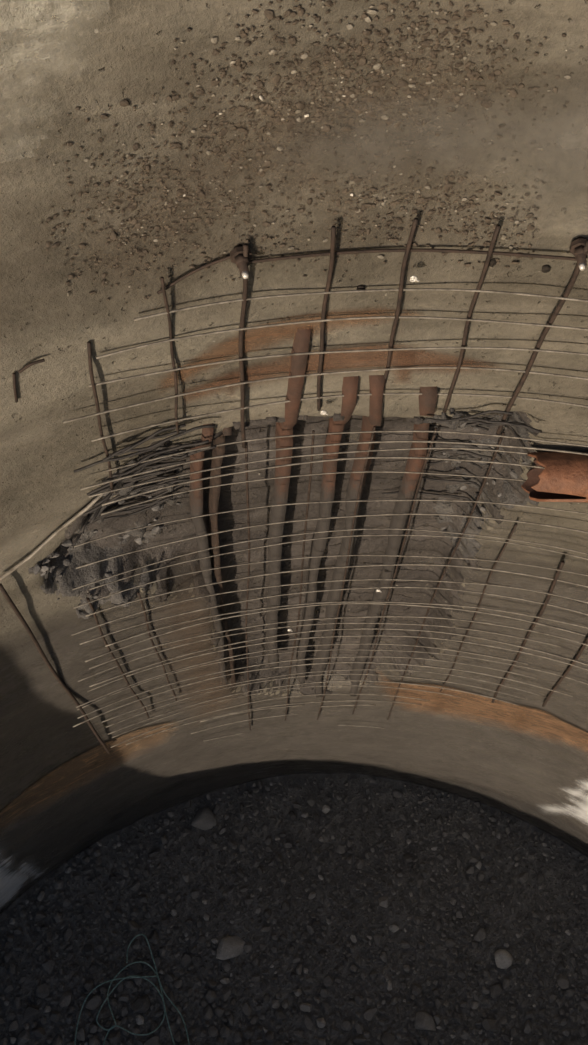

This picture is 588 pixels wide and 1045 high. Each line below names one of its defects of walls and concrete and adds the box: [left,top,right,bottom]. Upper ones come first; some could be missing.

spalling [28,408,542,696]
corrosion [165,312,486,698]